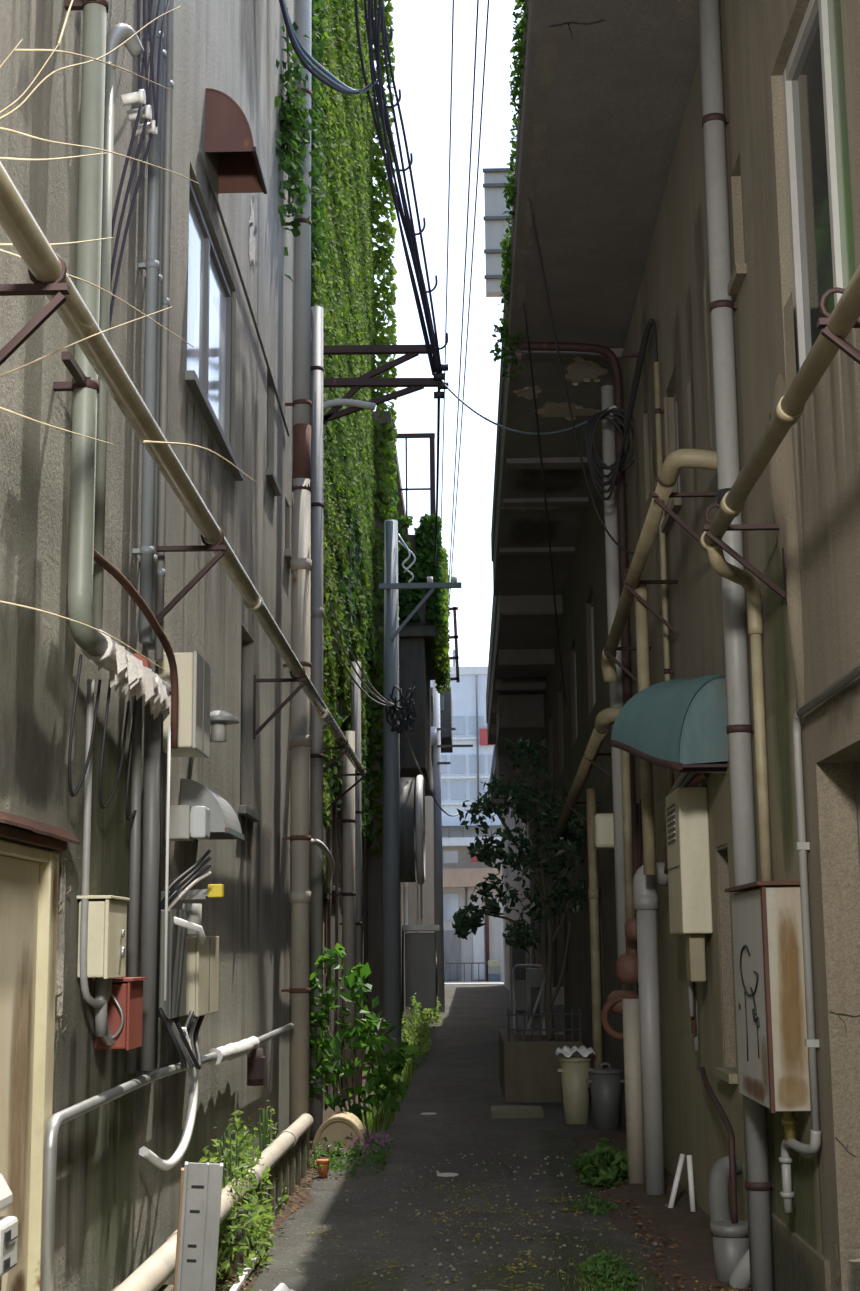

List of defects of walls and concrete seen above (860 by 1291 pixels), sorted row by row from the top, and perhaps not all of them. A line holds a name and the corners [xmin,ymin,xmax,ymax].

crack [549,20,603,37]
corrosion [746,936,803,1106]